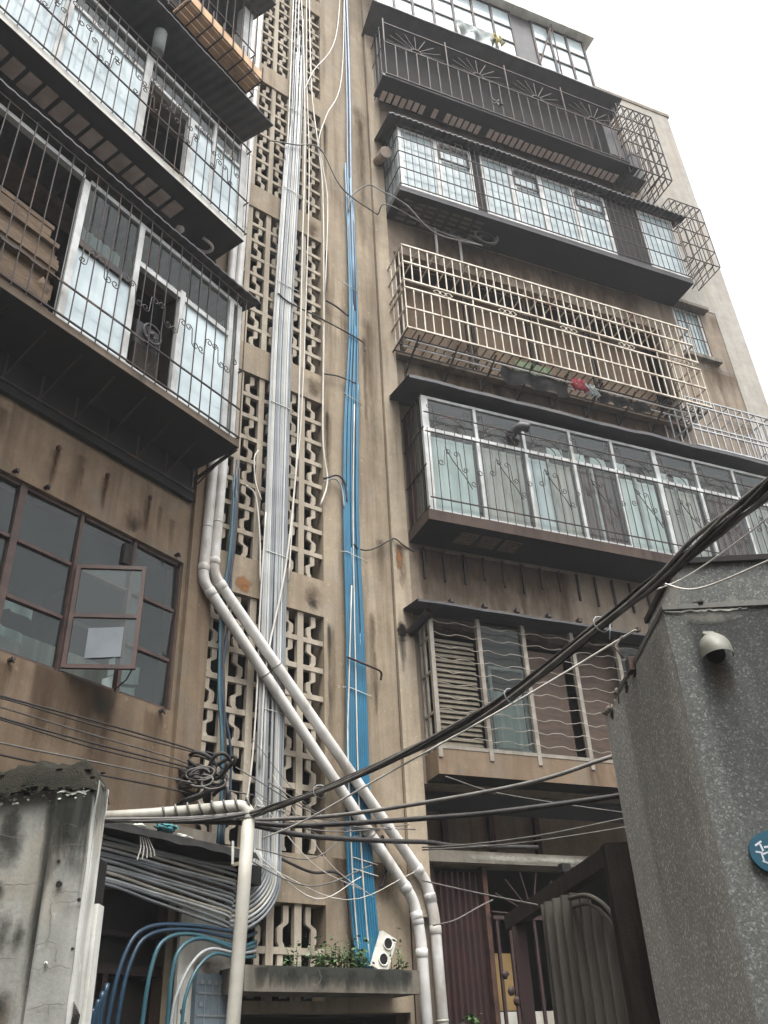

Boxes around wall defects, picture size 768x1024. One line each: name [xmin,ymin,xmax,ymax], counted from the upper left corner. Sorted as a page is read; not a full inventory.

peeling [0,788,91,806]
leakage [0,781,108,963]